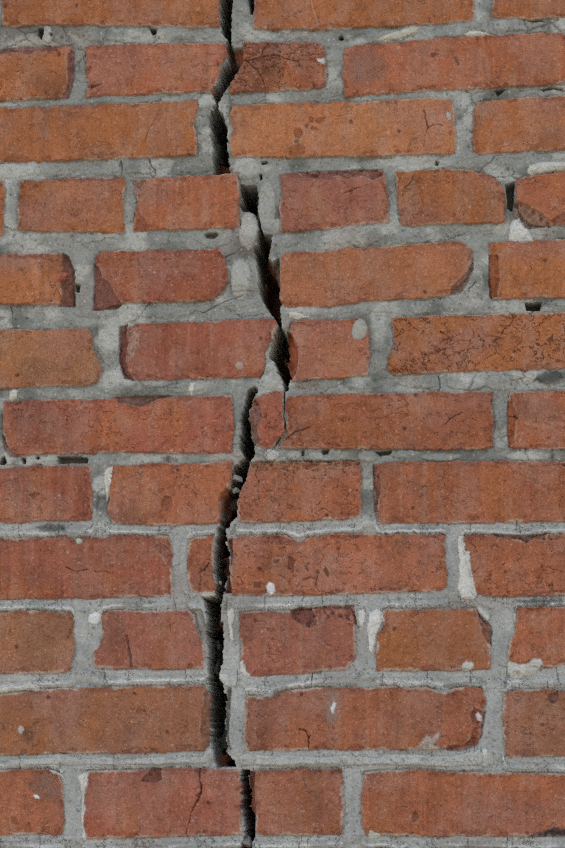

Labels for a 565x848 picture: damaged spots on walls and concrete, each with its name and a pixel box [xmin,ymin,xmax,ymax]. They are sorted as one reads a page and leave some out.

crack [210,0,314,175]
crack [194,187,309,446]
crack [186,389,262,848]
crack [298,728,311,751]